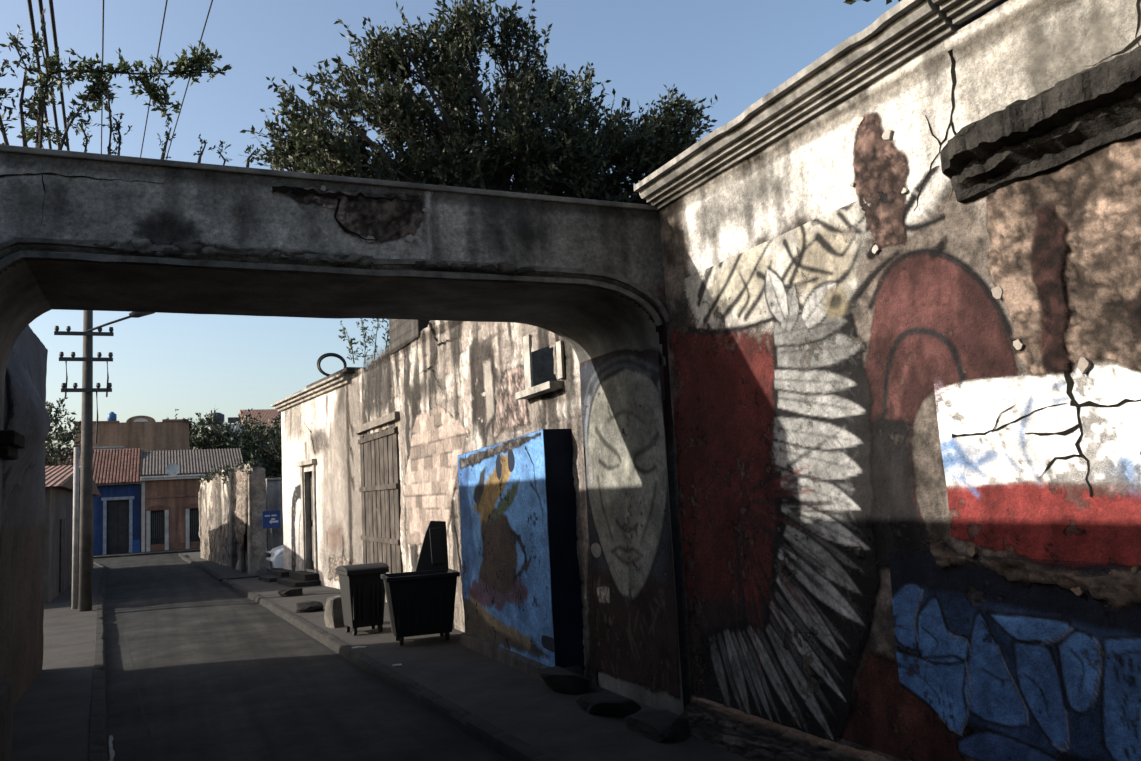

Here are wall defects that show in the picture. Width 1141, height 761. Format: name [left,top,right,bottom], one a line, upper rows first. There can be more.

flaking render [76,185,428,267]
flaking render [414,261,535,275]
flaking render [986,136,1141,376]
flaking render [404,364,541,546]
crack [952,365,1141,497]
flaking render [926,538,1141,609]